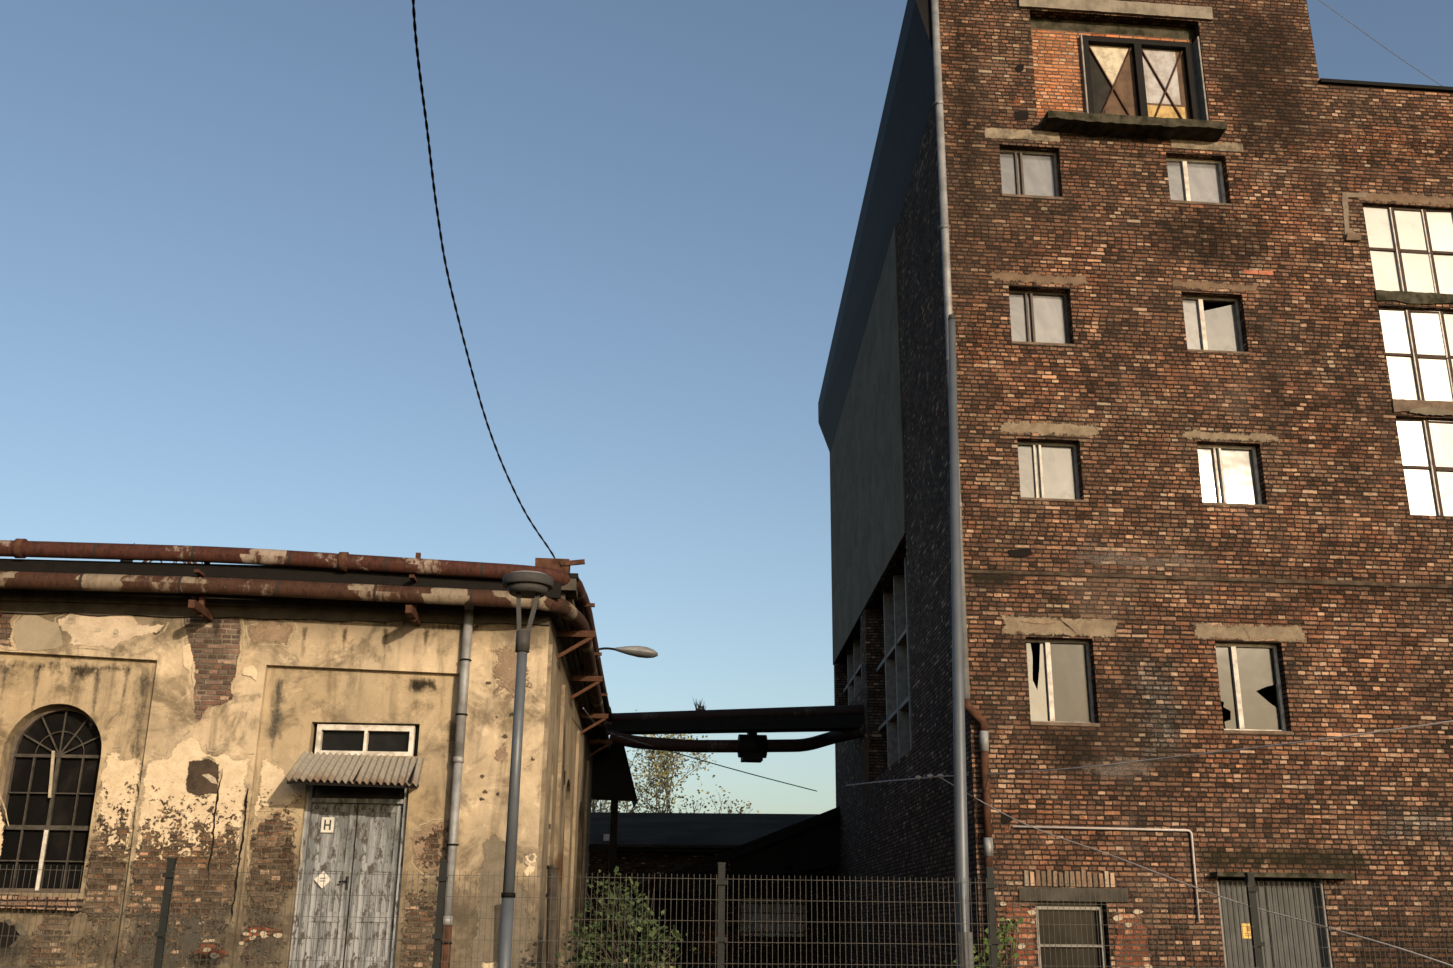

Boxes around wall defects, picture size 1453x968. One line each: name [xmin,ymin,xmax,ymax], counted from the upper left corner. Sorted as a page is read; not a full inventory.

peeling [0,613,302,968]
peeling [400,817,450,968]